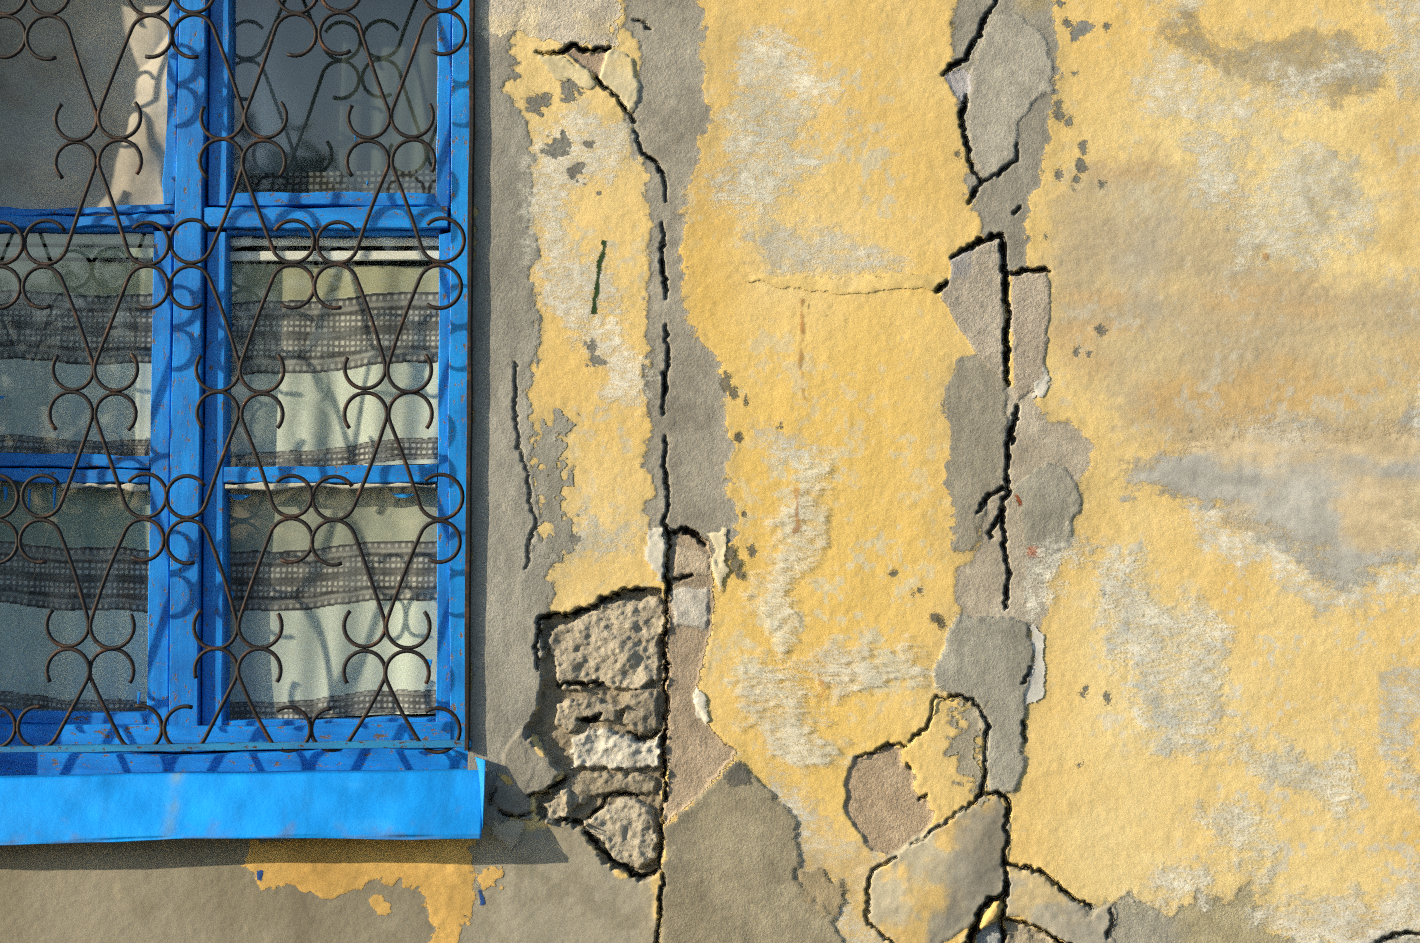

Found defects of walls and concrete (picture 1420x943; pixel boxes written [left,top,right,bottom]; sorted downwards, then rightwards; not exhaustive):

peeling [944,68,972,117]
crack [943,0,1018,202]
peeling [1054,140,1108,191]
peeling [1056,0,1112,42]
peeling [719,370,749,406]
crack [937,207,1049,609]
crack [489,43,705,943]
spalling [475,408,939,943]
peeling [944,697,993,807]
crack [856,695,1114,943]
peeling [959,798,1420,943]
crack [1376,931,1420,943]